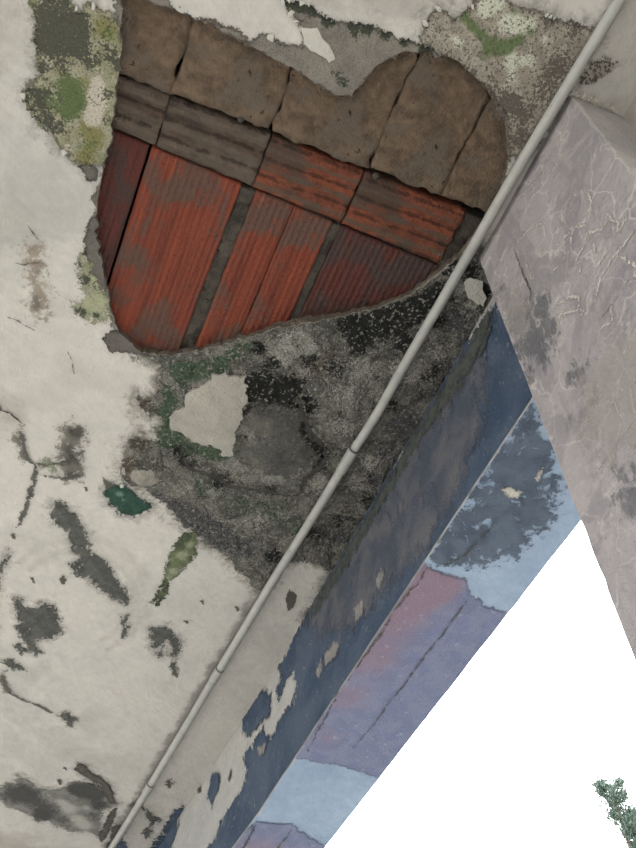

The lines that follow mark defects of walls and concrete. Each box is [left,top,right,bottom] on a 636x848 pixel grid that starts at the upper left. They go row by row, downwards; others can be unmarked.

peeling [555,54,618,120]
spalling [77,0,595,357]
crack [511,188,636,339]
damp [55,415,88,485]
damp [49,500,132,639]
peeling [206,301,532,848]
damp [0,595,78,728]
damp [148,625,183,678]
damp [0,764,127,848]
peeling [149,804,185,848]